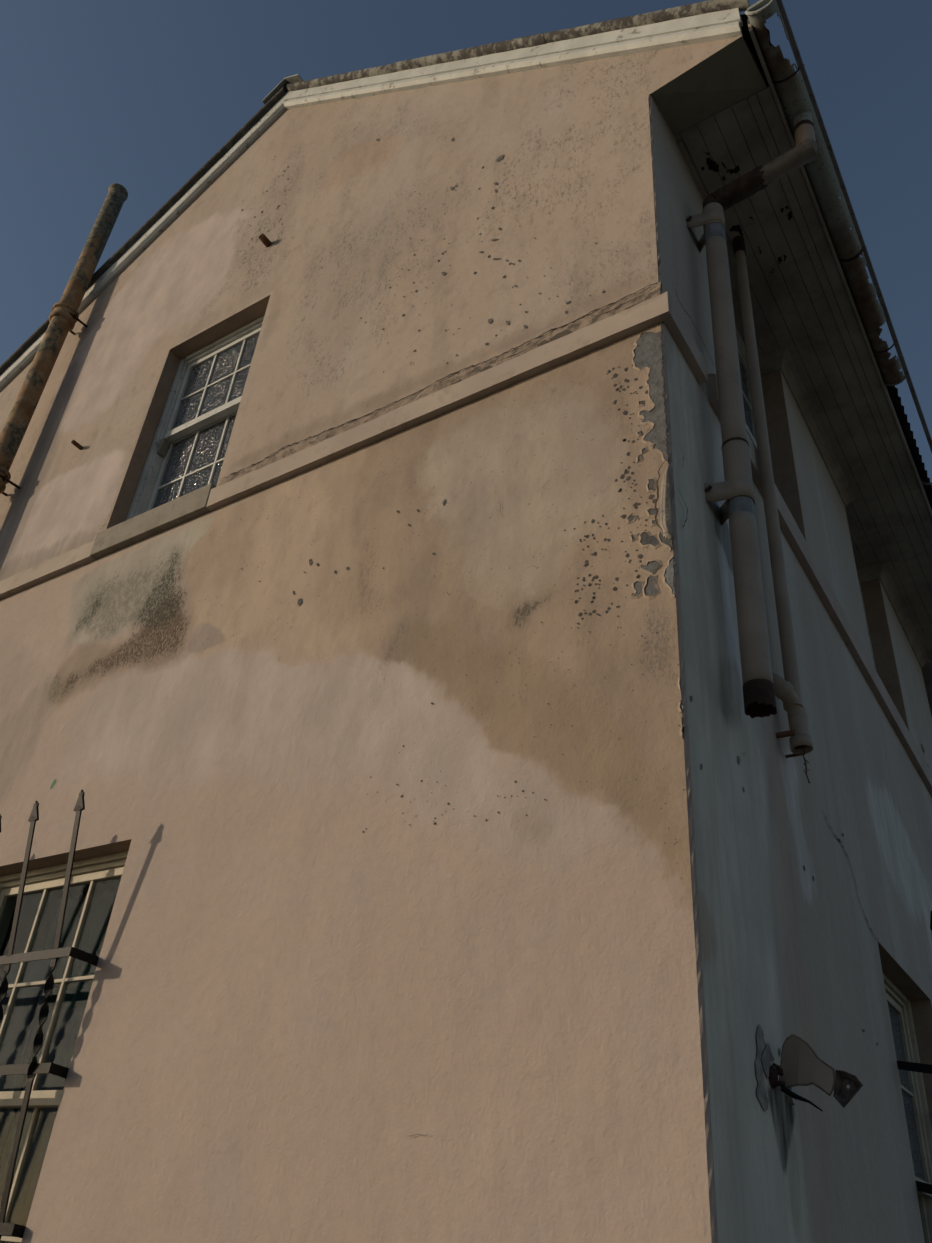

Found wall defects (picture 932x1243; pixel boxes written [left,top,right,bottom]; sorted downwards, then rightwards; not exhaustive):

flaking render [218,282,661,486]
crack [219,281,713,481]
peeling [564,331,676,632]
damp [0,323,719,977]